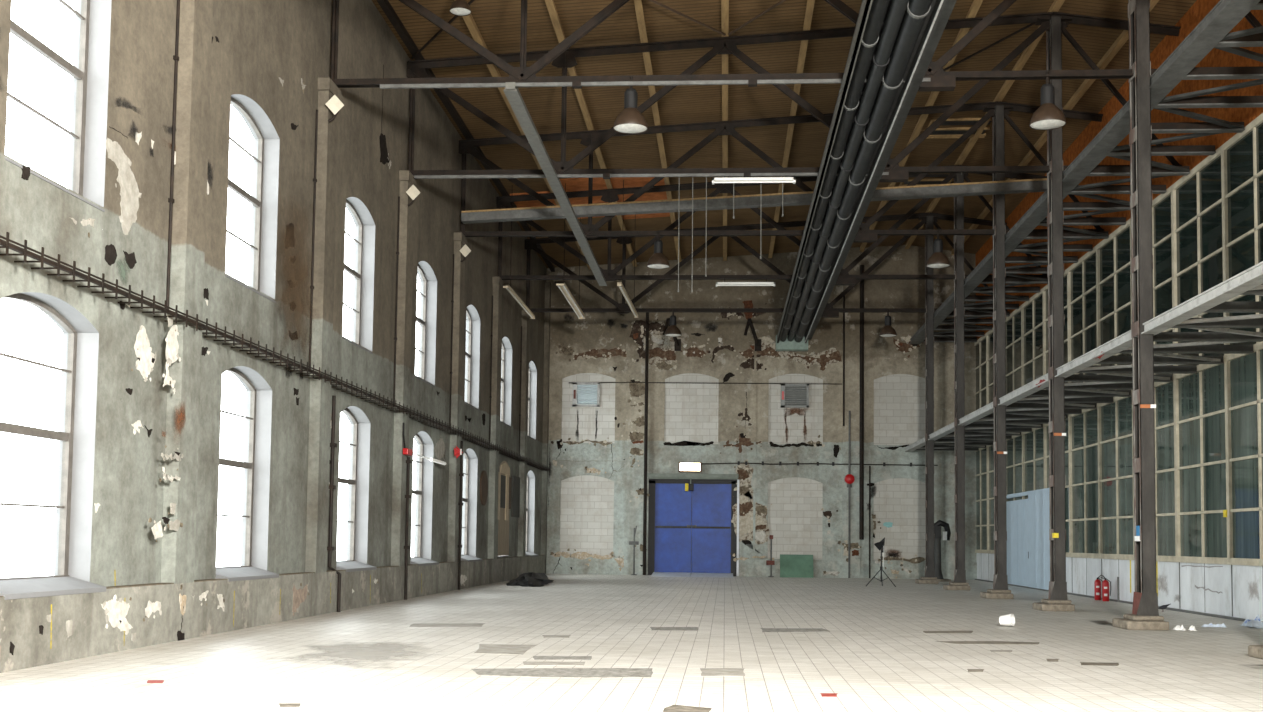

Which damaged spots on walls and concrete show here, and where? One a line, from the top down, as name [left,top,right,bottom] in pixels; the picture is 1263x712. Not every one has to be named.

peeling [105,138,142,235]
spalling [105,244,137,282]
peeling [126,310,181,395]
spalling [556,319,842,467]
spalling [131,420,153,437]
peeling [159,445,183,482]
peeling [720,426,774,562]
peeling [148,503,183,542]
peeling [101,595,162,642]